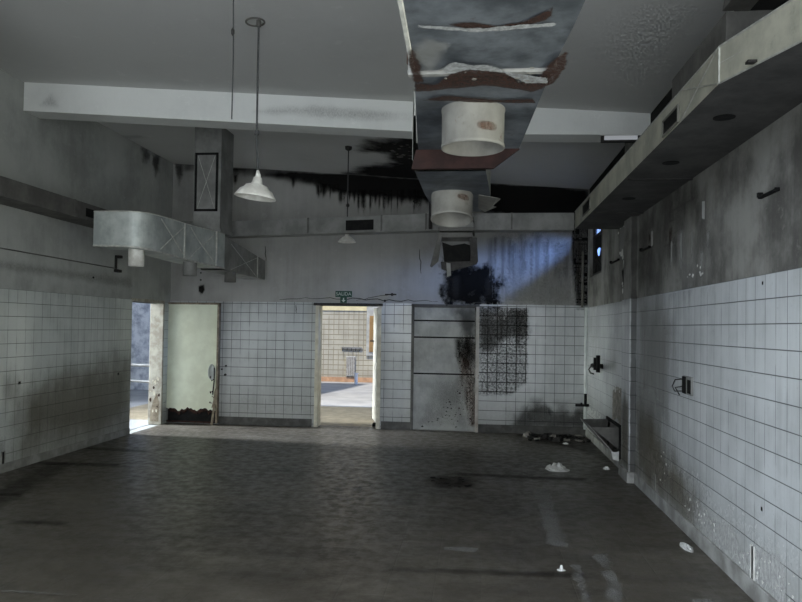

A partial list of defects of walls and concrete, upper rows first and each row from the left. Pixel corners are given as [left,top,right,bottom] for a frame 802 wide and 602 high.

corrosion [418,9,556,32]
corrosion [408,50,568,103]
damp [317,185,428,208]
damp [439,264,528,394]
damp [622,216,795,602]